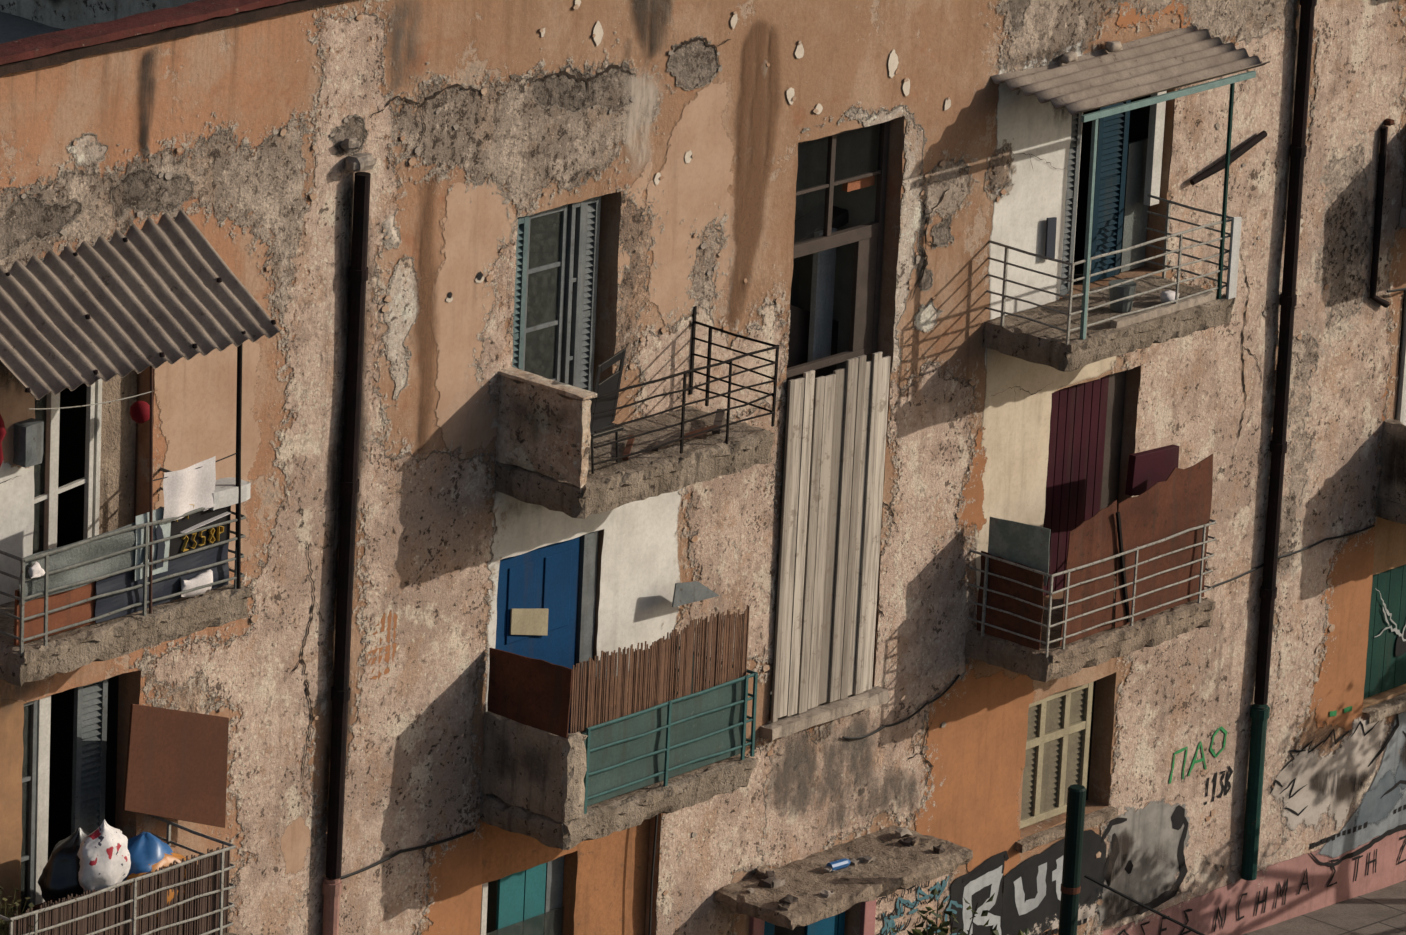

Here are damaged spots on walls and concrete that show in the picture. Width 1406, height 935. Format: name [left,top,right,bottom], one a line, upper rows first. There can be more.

leakage [141,50,155,149]
leakage [627,77,656,164]
leakage [634,0,671,55]
leakage [731,23,781,323]
flaking render [0,0,990,935]
flaking render [985,0,1406,935]
crack [289,543,323,782]